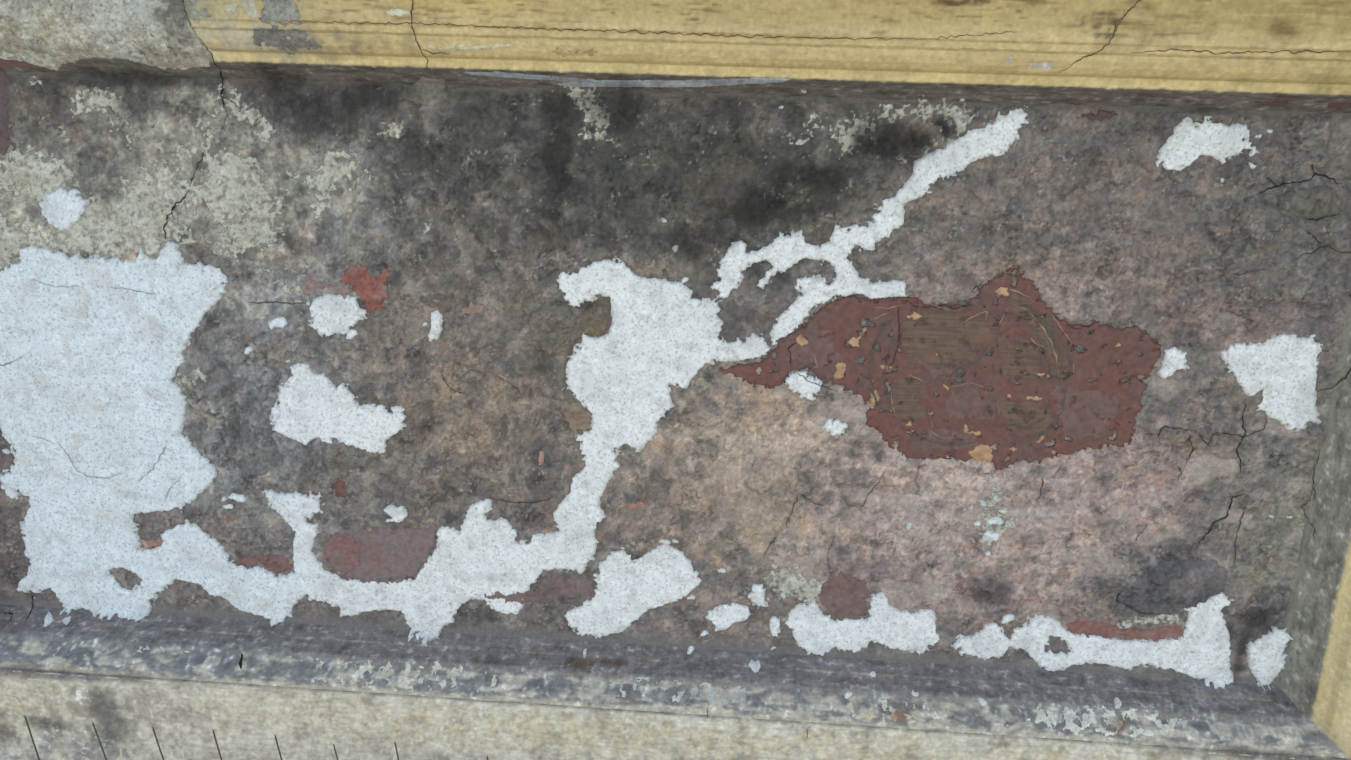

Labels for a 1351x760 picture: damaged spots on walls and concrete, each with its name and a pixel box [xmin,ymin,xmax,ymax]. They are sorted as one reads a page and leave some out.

crack [269,0,1022,72]
crack [1060,0,1347,73]
crack [163,7,238,239]
flaking render [1155,116,1273,183]
flaking render [0,0,1029,657]
flaking render [1158,347,1190,379]
flaking render [1221,333,1324,432]
peeling [41,640,190,668]
flaking render [687,563,1294,690]
peeling [287,656,497,732]
peeling [584,677,745,706]
peeling [823,690,952,724]